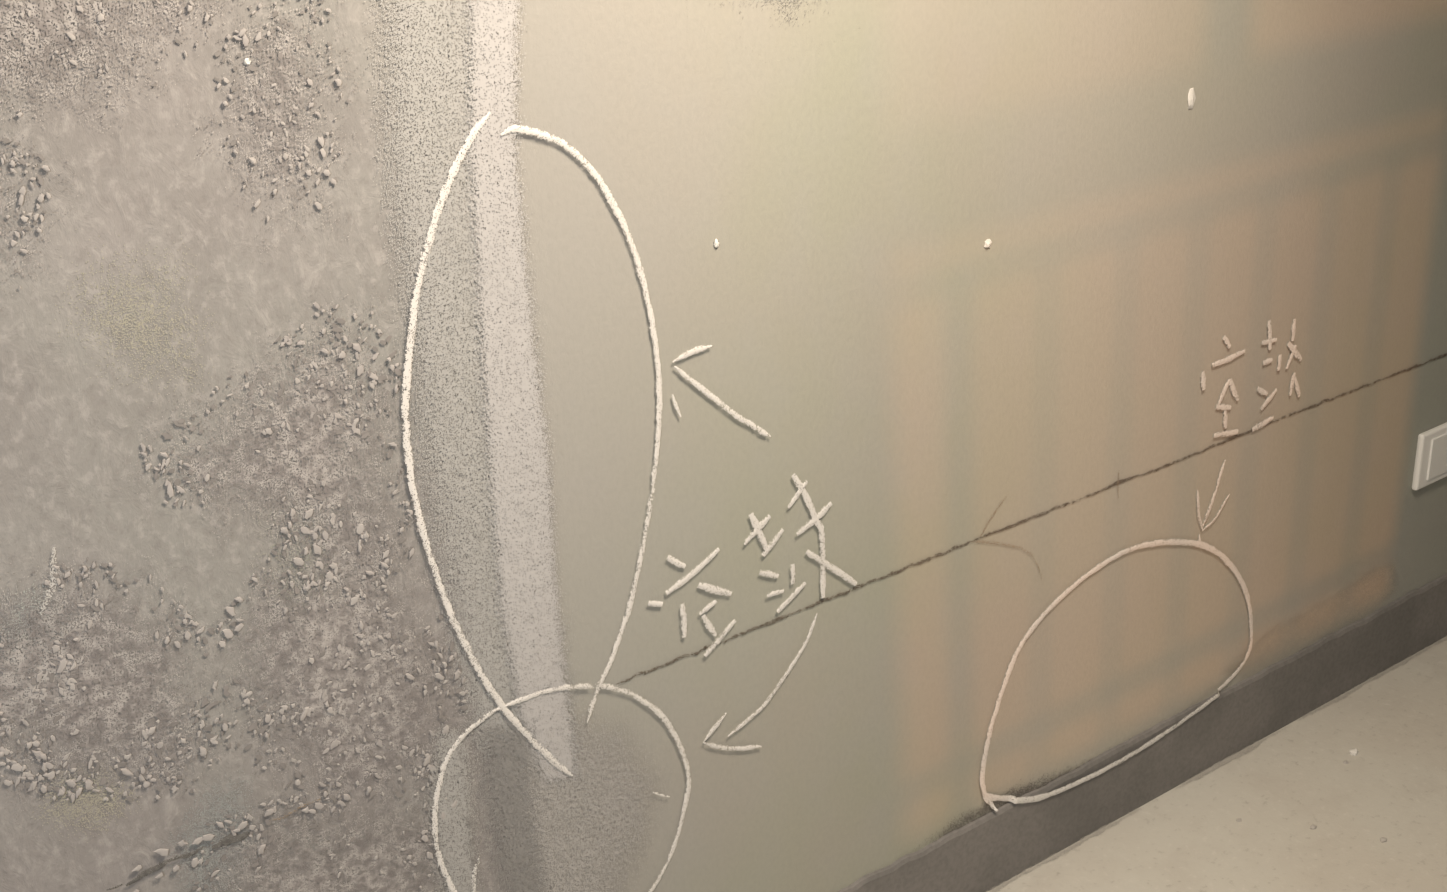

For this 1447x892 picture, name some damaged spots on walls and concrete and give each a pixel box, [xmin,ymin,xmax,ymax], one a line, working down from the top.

crack [617,353,1447,684]